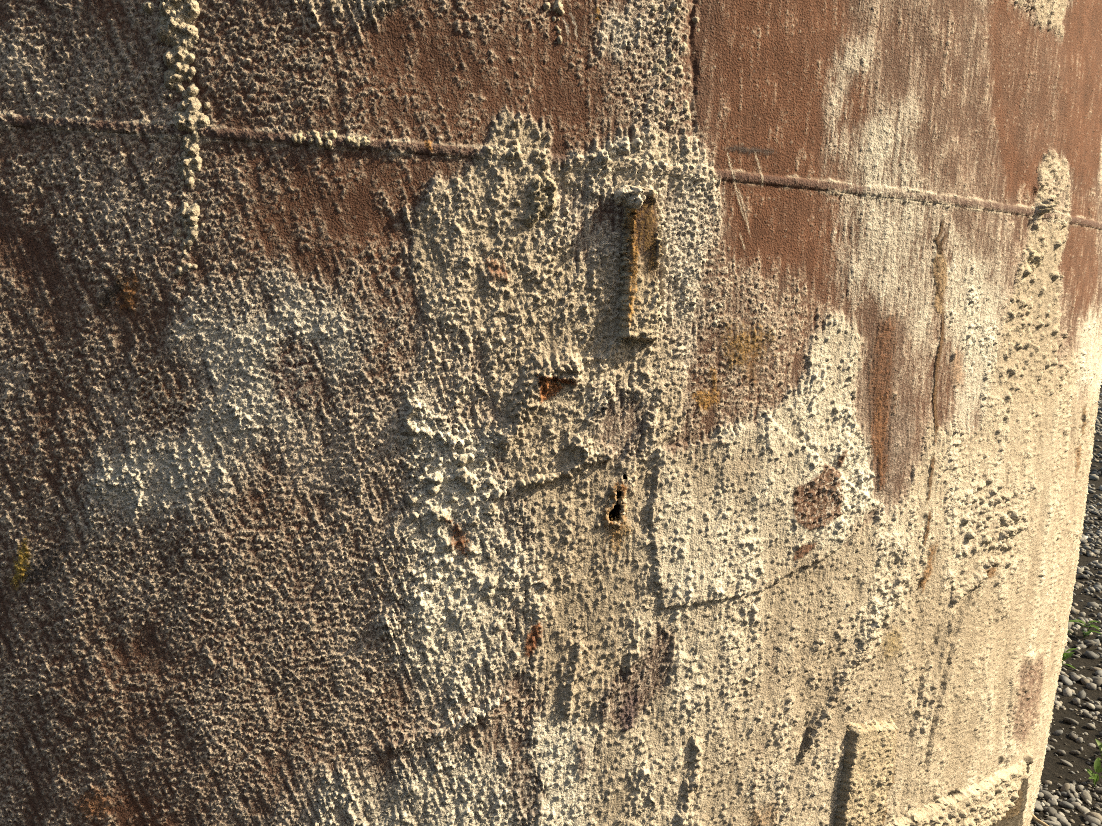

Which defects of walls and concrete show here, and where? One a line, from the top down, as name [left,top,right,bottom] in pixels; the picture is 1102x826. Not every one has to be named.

corrosion [624,208,642,326]
corrosion [722,320,774,383]
corrosion [869,314,915,501]